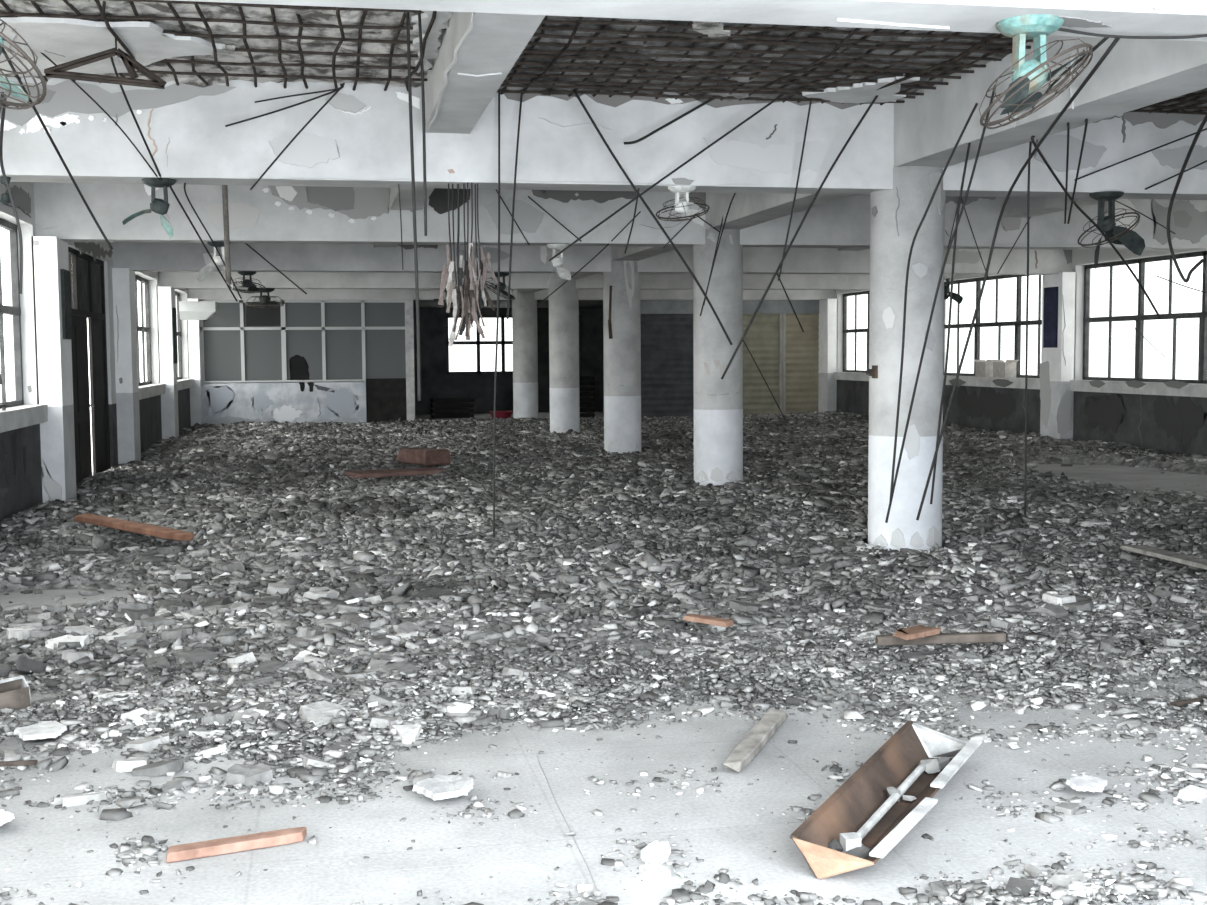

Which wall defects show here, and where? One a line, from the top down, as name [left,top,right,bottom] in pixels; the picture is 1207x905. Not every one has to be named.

spalling [0,0,440,134]
spalling [499,15,1027,109]